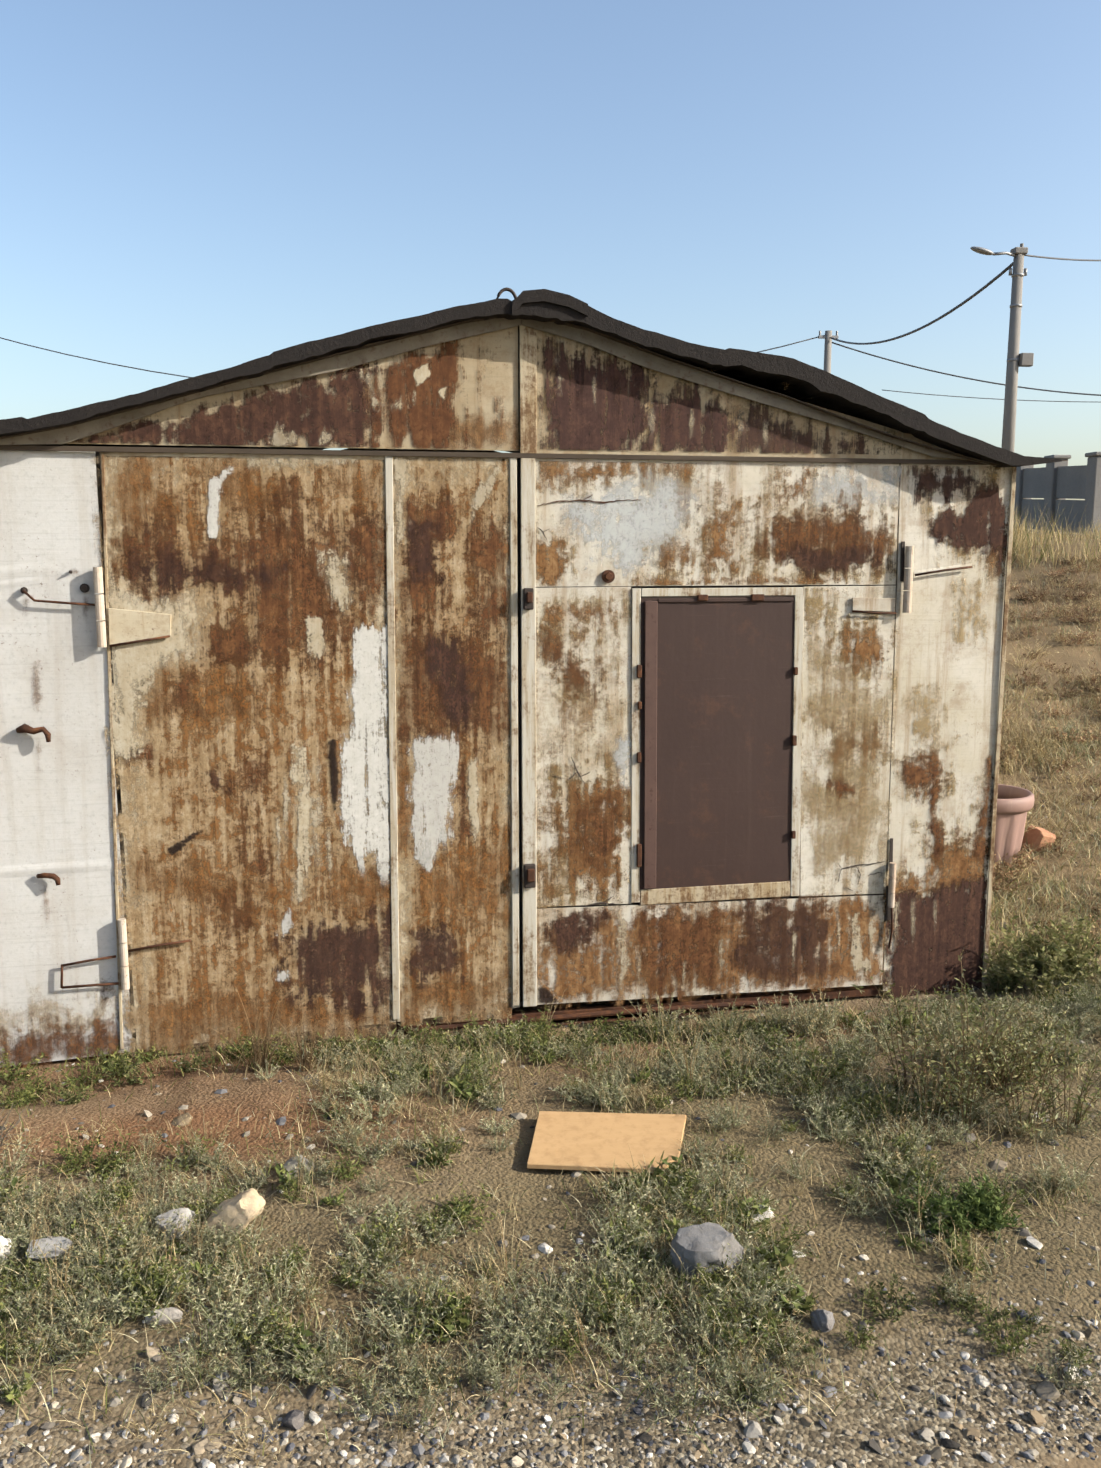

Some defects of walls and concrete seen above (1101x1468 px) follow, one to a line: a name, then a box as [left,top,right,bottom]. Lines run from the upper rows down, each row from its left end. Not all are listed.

rust [536,337,897,720]
rust [902,465,1008,581]
rust [75,340,519,1056]
rust [537,733,994,1007]
rust [0,988,124,1069]